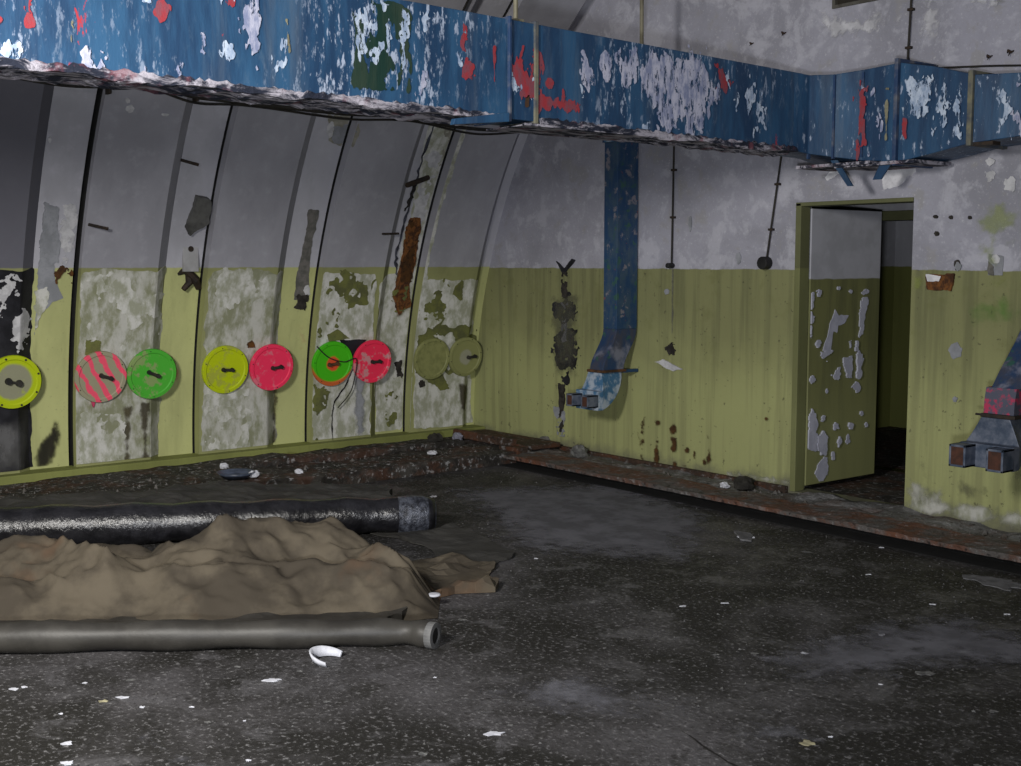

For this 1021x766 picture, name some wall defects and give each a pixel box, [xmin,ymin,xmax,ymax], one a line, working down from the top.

peeling [0,39,23,59]
peeling [80,45,108,69]
peeling [142,0,171,23]
peeling [218,0,261,70]
peeling [271,19,291,72]
peeling [351,0,436,96]
peeling [512,44,767,138]
corrosion [391,217,421,315]
peeling [0,202,167,464]
peeling [415,278,478,351]
peeling [413,364,476,429]
crack [682,731,738,766]